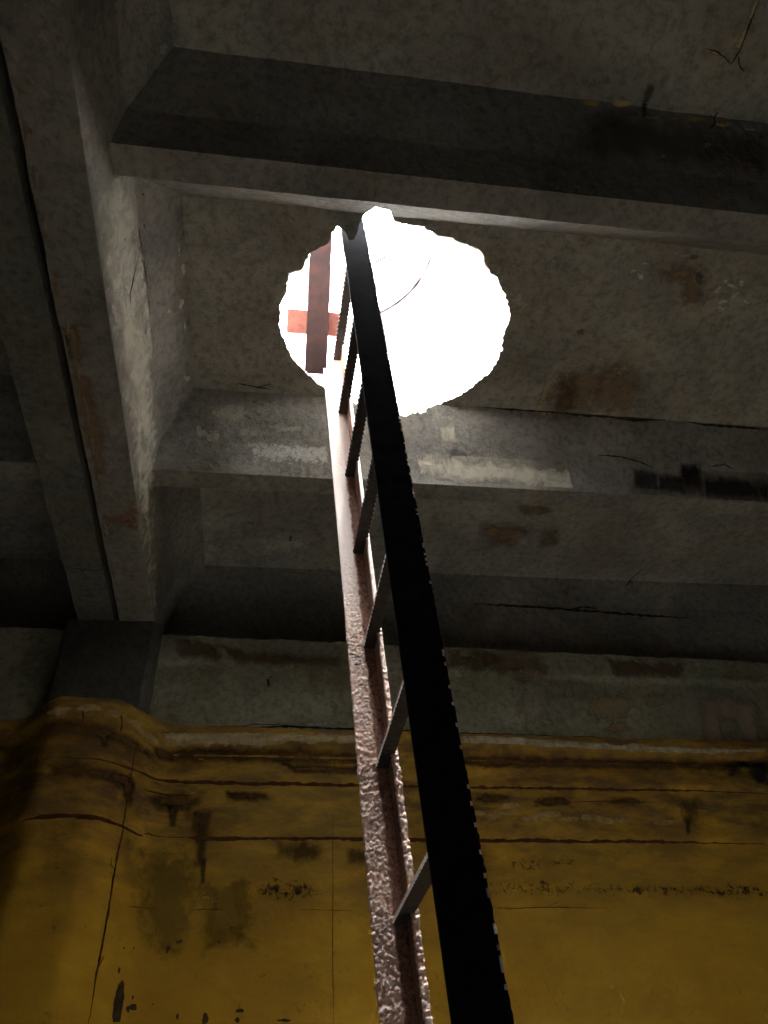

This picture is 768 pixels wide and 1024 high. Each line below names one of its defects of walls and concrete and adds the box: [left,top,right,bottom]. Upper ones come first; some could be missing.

crack [707,0,760,72]
leakage [634,464,768,502]
crack [475,603,692,619]
crack [469,785,764,803]
crack [408,836,426,844]
crack [479,837,764,845]
crack [20,715,364,1023]
leakage [143,792,247,952]